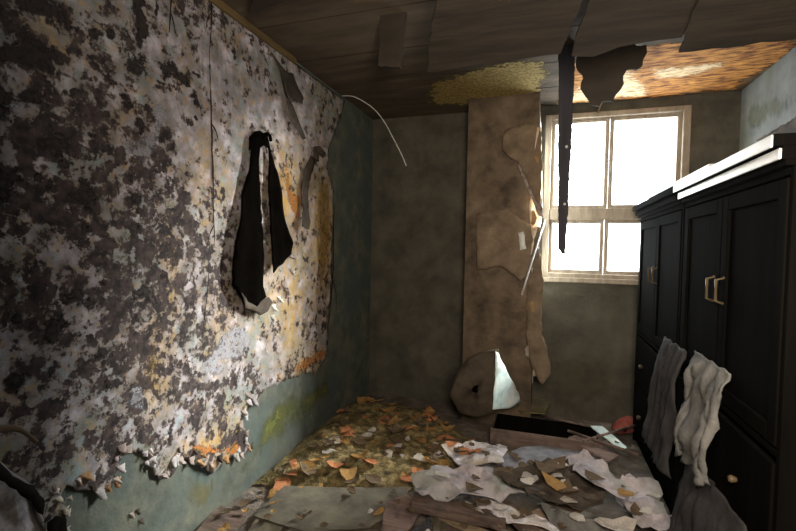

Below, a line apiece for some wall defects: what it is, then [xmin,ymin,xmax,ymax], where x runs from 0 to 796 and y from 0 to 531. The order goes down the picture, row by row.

damp [14,0,116,41]
damp [0,85,46,119]
damp [120,93,156,135]
damp [124,0,204,121]
peeling [573,88,588,102]
peeling [616,71,649,97]
peeling [653,63,722,79]
damp [60,288,99,342]
damp [131,282,161,325]
peeling [270,253,296,321]
peeling [75,390,259,500]
rust [193,444,240,454]